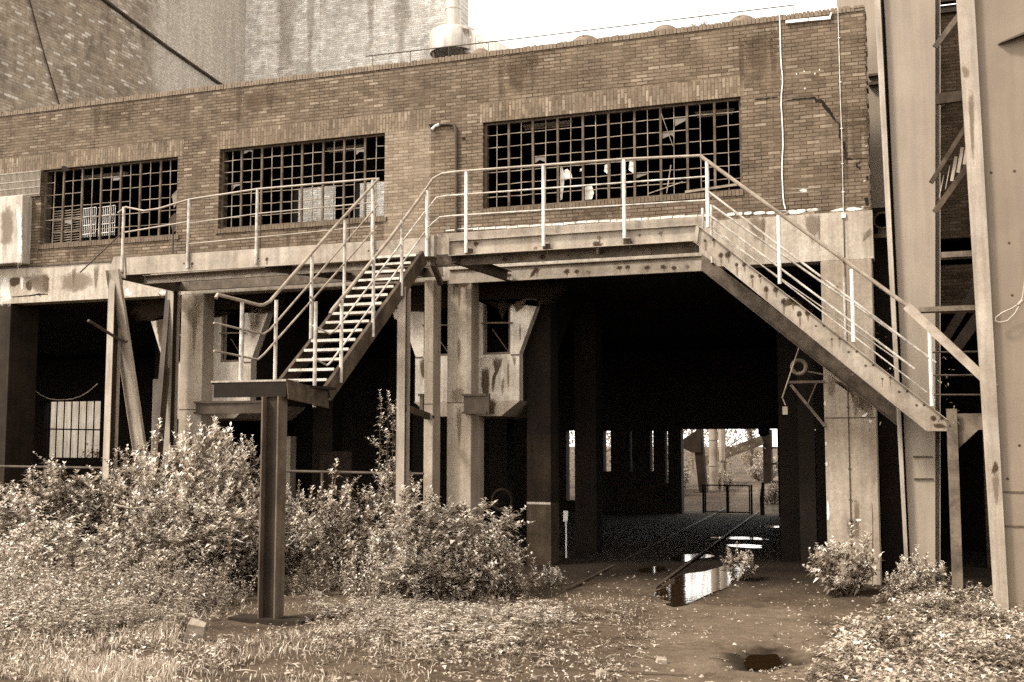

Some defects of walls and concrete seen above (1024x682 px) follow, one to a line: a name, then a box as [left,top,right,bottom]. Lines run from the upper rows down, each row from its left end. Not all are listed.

crack [753,97,867,170]
damp [2,206,22,261]